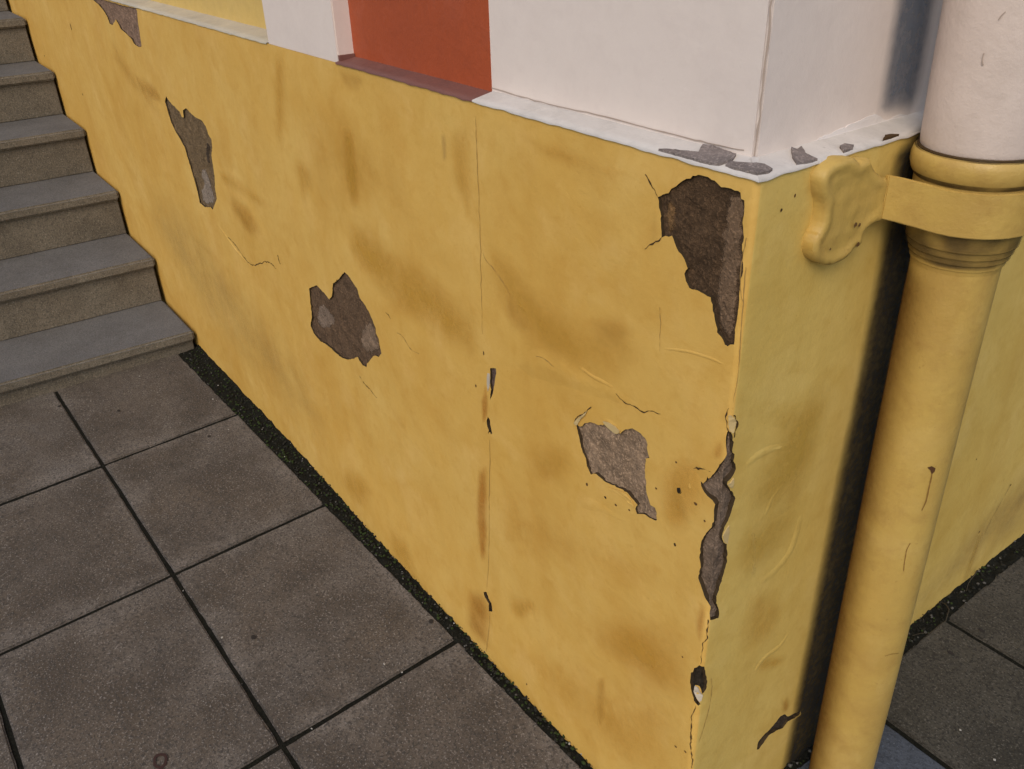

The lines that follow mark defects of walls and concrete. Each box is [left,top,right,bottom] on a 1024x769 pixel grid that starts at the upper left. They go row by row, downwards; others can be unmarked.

spalling [95,0,142,47]
spalling [167,99,217,208]
spalling [791,146,818,165]
spalling [658,144,773,345]
spalling [311,273,381,365]
spalling [475,368,496,395]
spalling [574,411,657,519]
spalling [701,415,736,617]
spalling [693,665,705,702]
spalling [757,713,795,746]